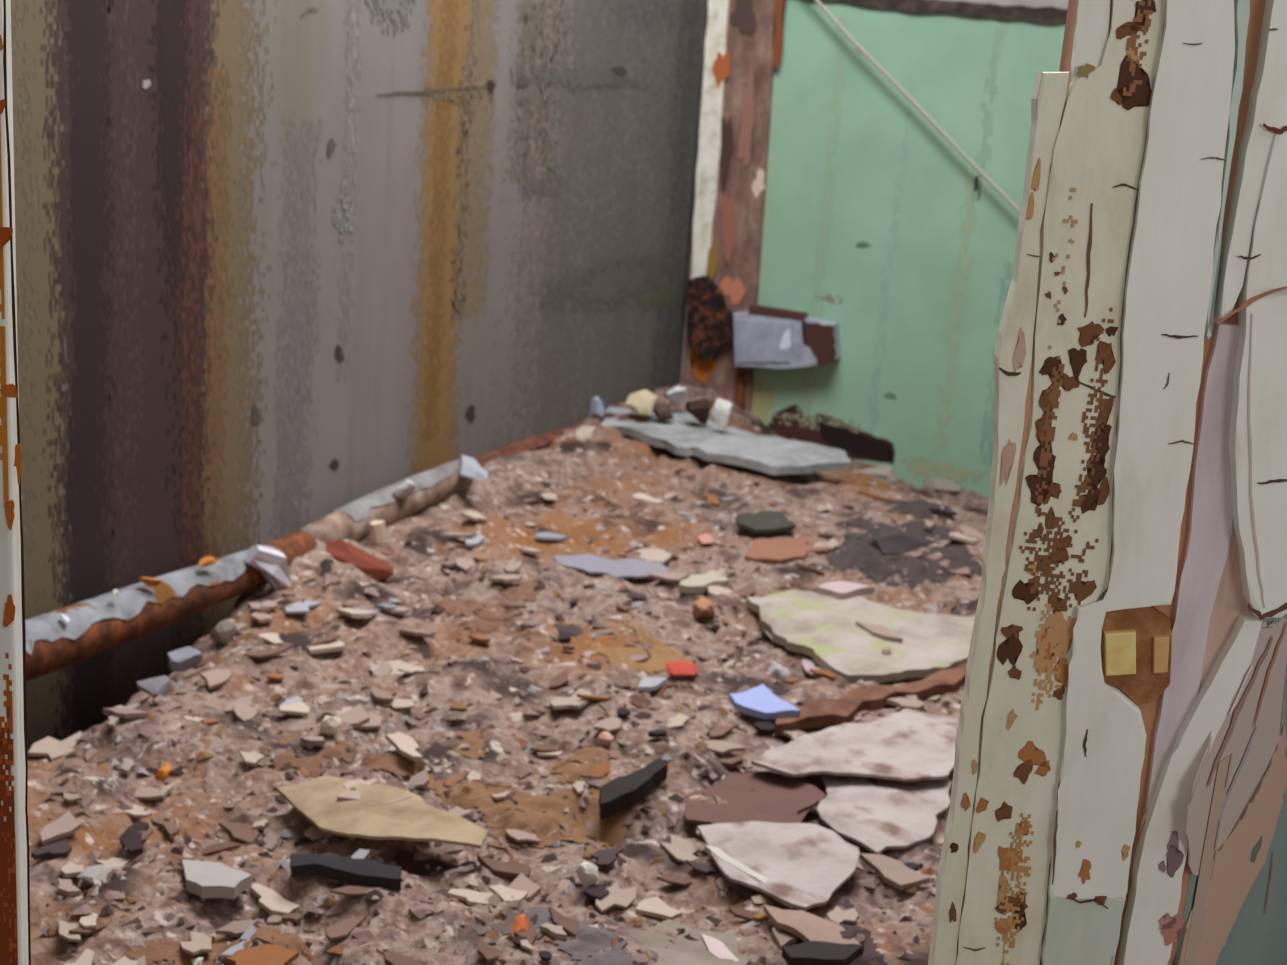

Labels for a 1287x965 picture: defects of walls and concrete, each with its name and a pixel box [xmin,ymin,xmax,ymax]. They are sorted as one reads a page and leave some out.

rust [1110,0,1156,110]
rust [0,99,22,530]
rust [406,0,479,477]
rust [997,188,1118,710]
rust [3,594,16,628]
rust [139,577,161,586]
rust [175,602,226,649]
peeling [1198,526,1249,691]
rust [0,653,18,965]
rust [1007,709,1018,730]
rust [1013,741,1051,784]
peeling [1158,617,1287,965]